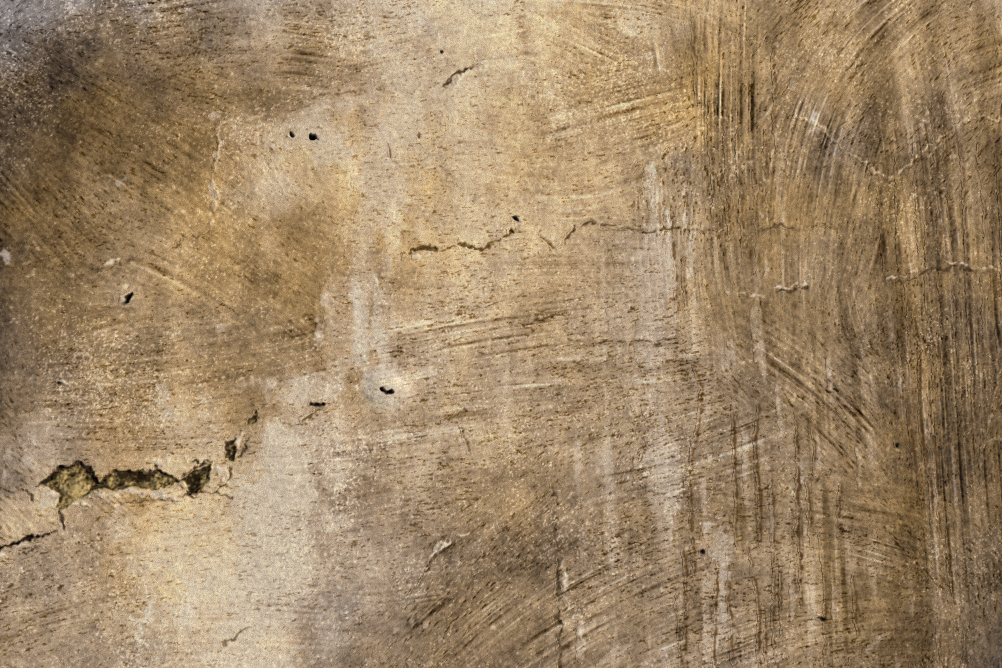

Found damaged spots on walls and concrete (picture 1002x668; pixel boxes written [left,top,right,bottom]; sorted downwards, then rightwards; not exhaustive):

crack [431,59,489,90]
crack [786,113,1002,183]
crack [402,217,718,259]
crack [885,260,1000,285]
spalling [2,404,265,531]
crack [0,529,58,558]